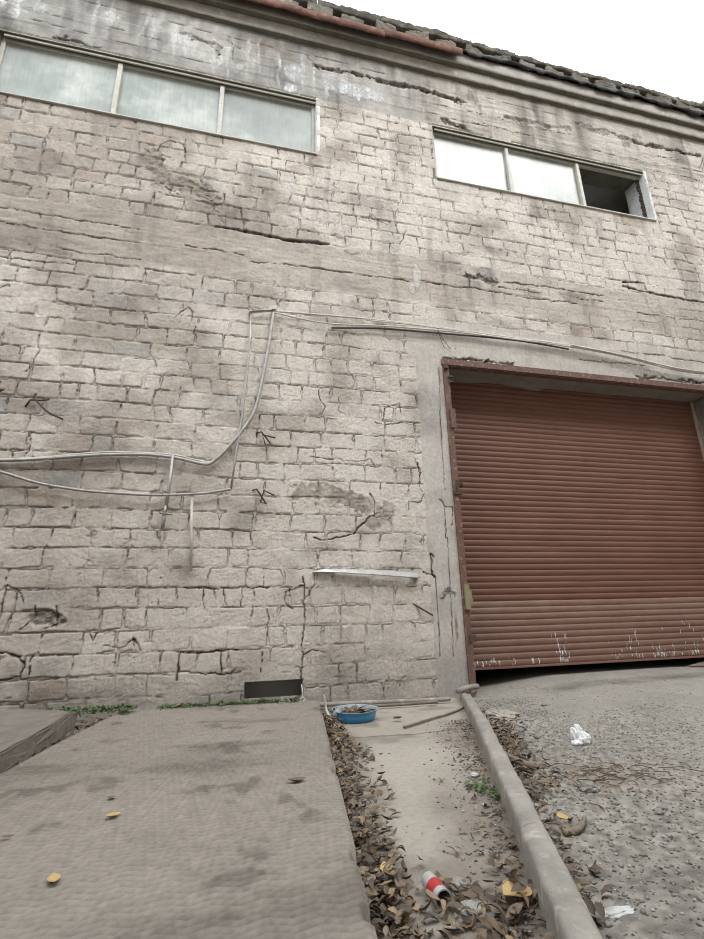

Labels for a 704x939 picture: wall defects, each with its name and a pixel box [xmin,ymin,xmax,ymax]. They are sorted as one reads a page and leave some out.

crack [33,1,337,62]
crack [185,245,603,304]
crack [0,584,58,630]
crack [0,652,34,681]